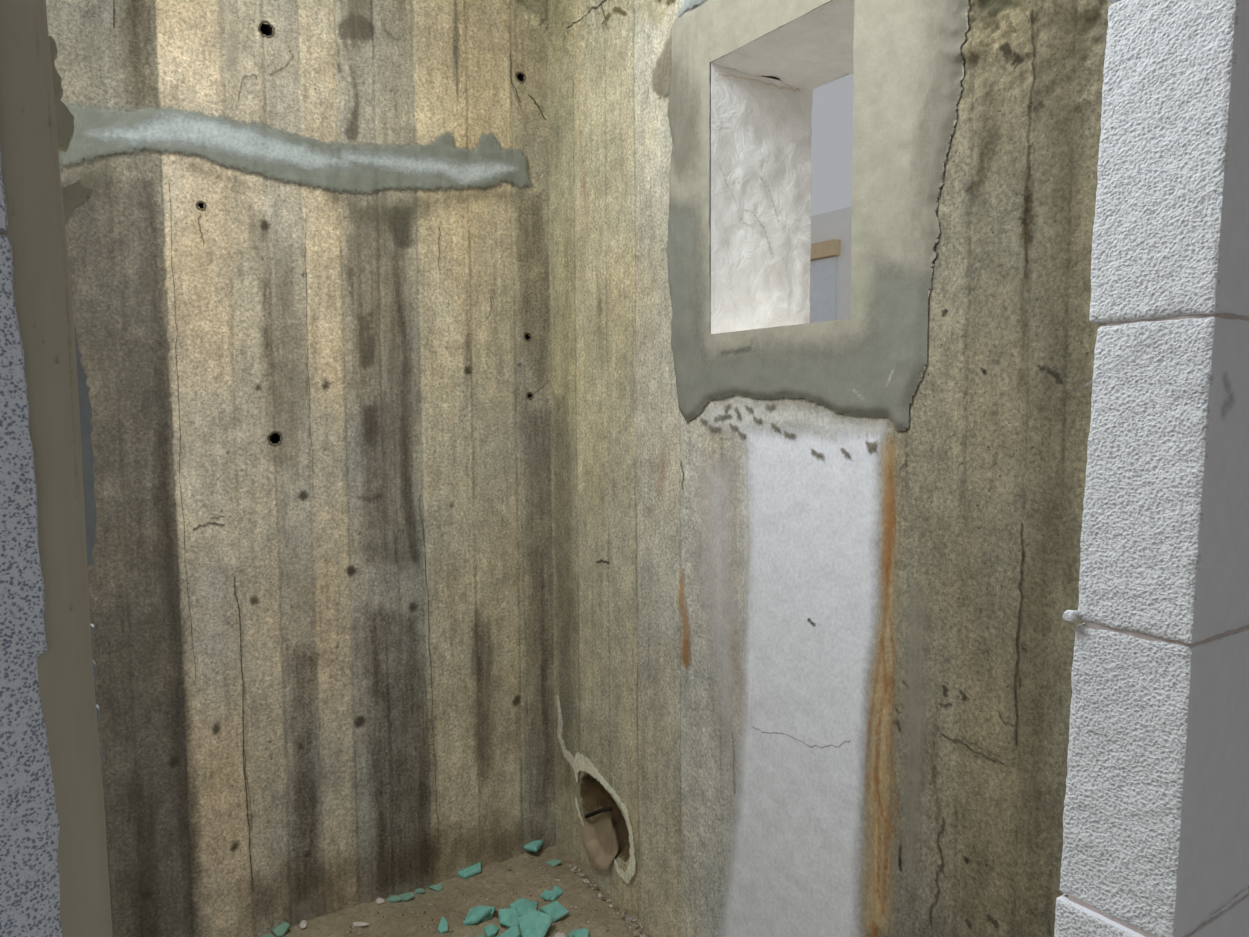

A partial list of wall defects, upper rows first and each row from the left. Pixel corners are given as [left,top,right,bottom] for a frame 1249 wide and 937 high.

crack [567,0,606,28]
water stain [924,0,1016,143]
water stain [667,200,932,937]
rust [868,452,894,937]
crack [1014,523,1027,745]